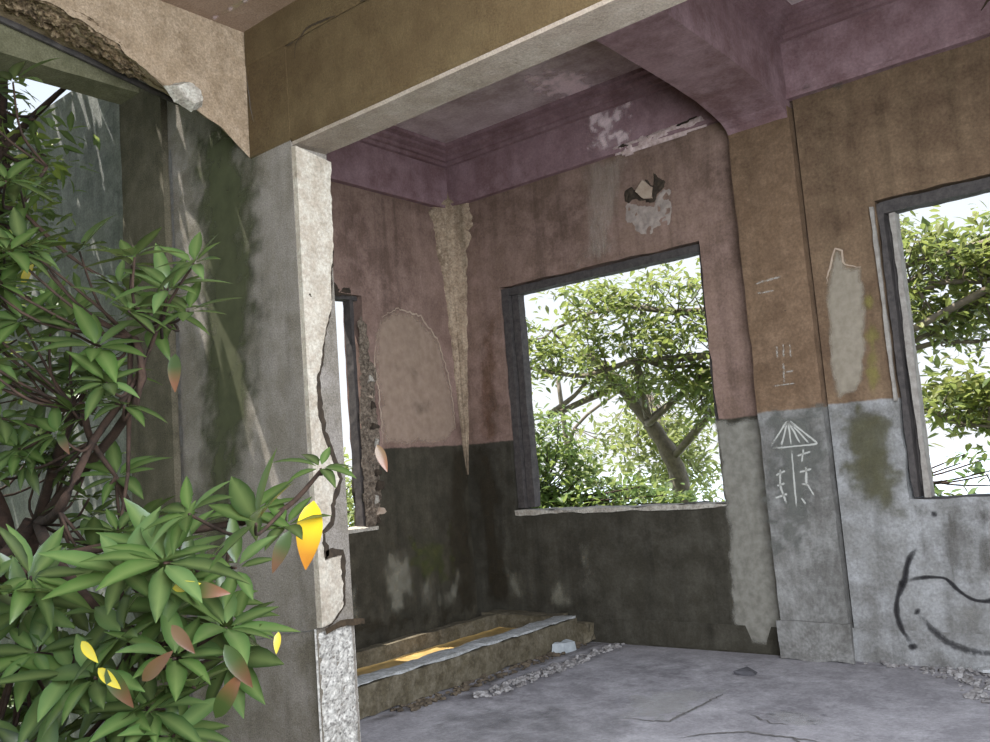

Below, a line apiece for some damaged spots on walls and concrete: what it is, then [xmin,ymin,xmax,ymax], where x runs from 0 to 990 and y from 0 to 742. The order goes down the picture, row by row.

spalling [0,0,203,112]
spalling [624,173,672,234]
spalling [613,116,707,157]
peeling [826,248,865,394]
peeling [357,307,455,527]
peeling [715,418,780,643]